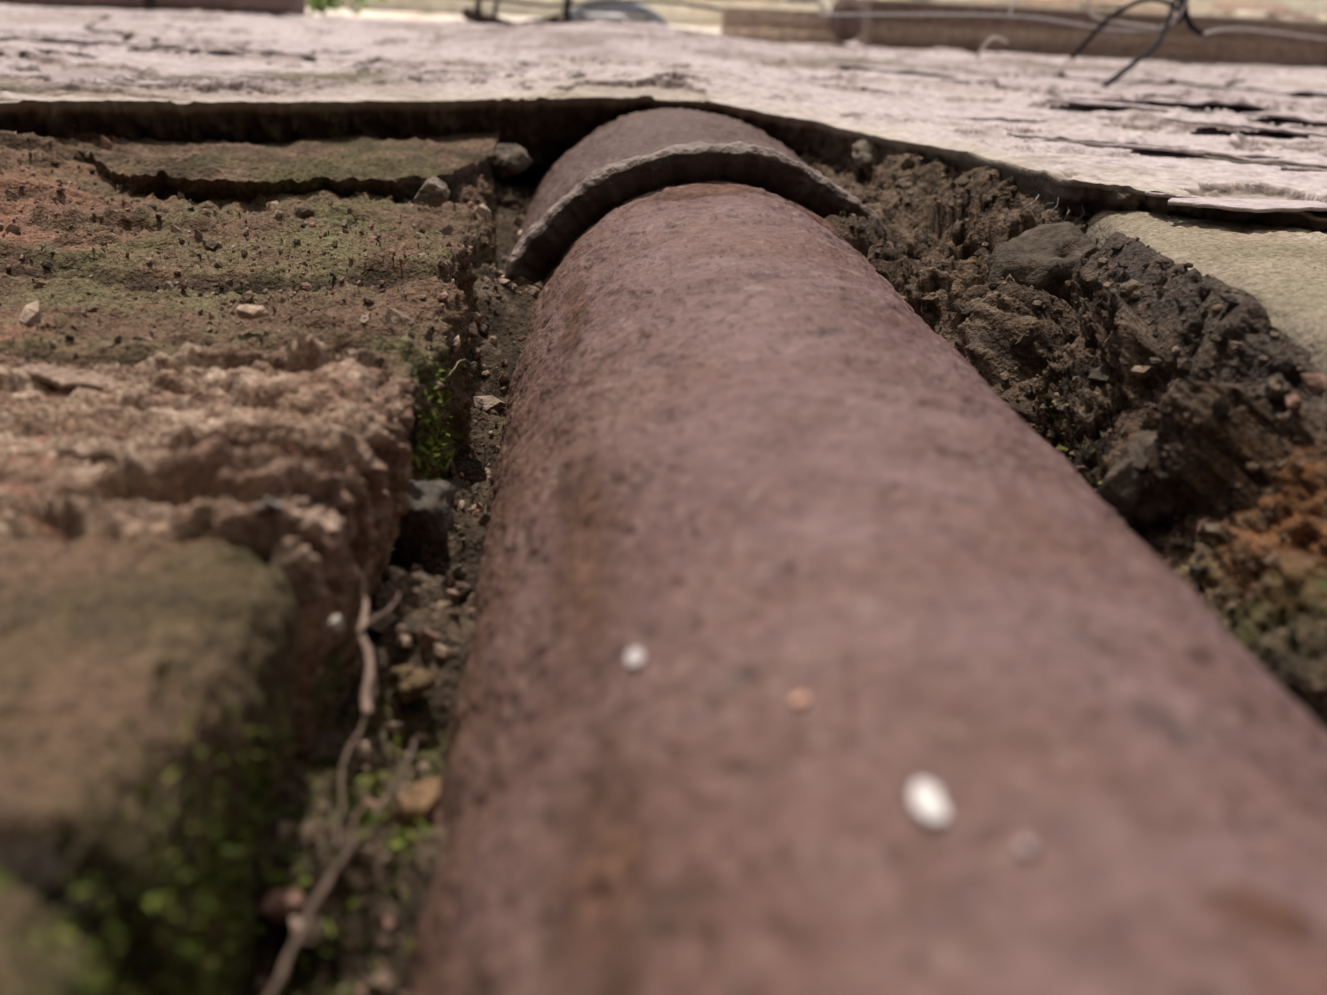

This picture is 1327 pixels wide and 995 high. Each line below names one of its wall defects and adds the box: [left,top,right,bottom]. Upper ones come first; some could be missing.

crack [908,66,1327,113]
crack [1006,133,1327,169]